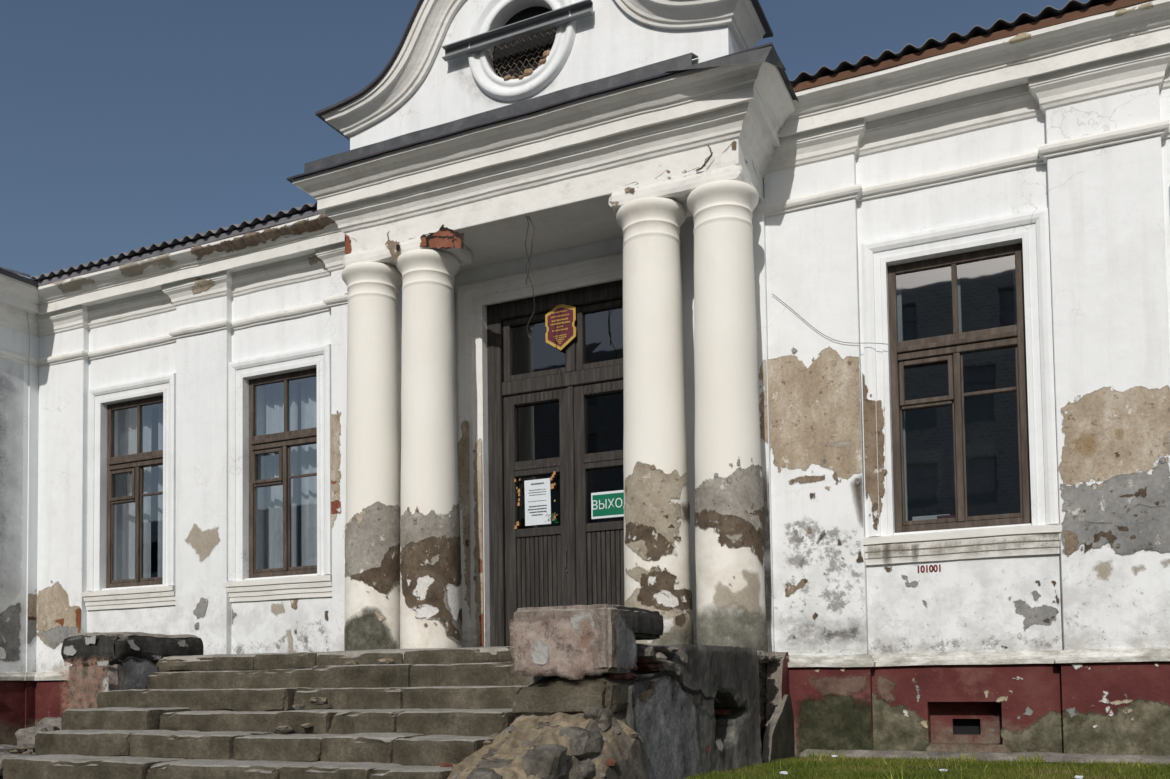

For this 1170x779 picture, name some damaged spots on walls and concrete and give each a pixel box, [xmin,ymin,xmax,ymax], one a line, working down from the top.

crack [630,144,757,185]
flaking render [190,213,335,260]
spalling [385,240,400,262]
flaking render [420,224,464,250]
peeling [1058,385,1170,579]
peeling [186,524,220,561]
peeling [331,411,483,647]
peeling [510,347,887,779]
peeling [27,580,161,709]
crack [636,670,720,754]
peeling [872,675,930,751]
peeling [1001,691,1170,756]